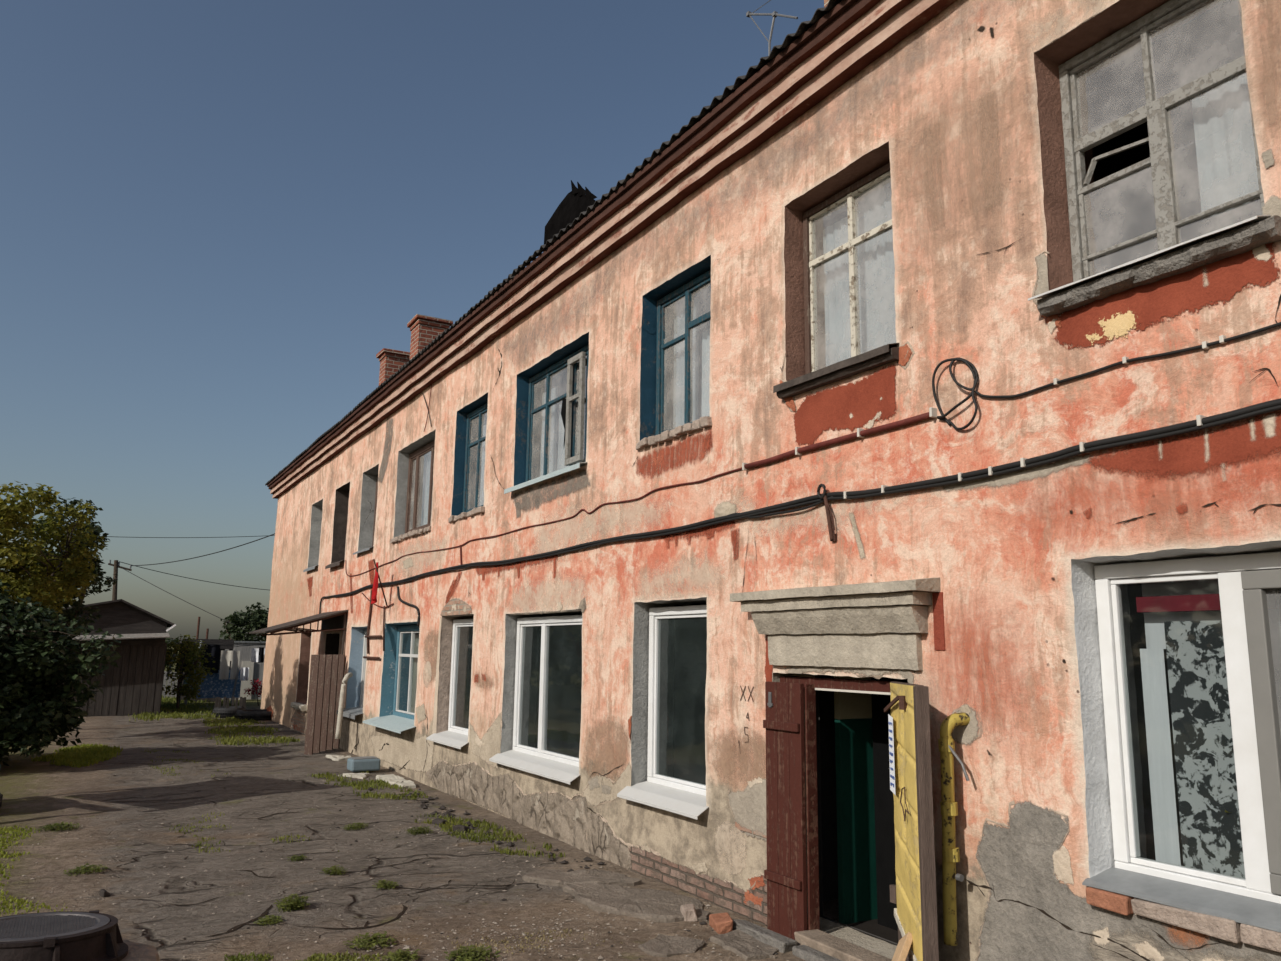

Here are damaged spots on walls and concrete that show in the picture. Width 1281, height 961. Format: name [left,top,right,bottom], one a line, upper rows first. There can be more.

peeling [1032,242,1281,349]
peeling [780,341,915,445]
spalling [371,598,767,927]
crack [966,879,1230,961]
peeling [975,801,1281,961]